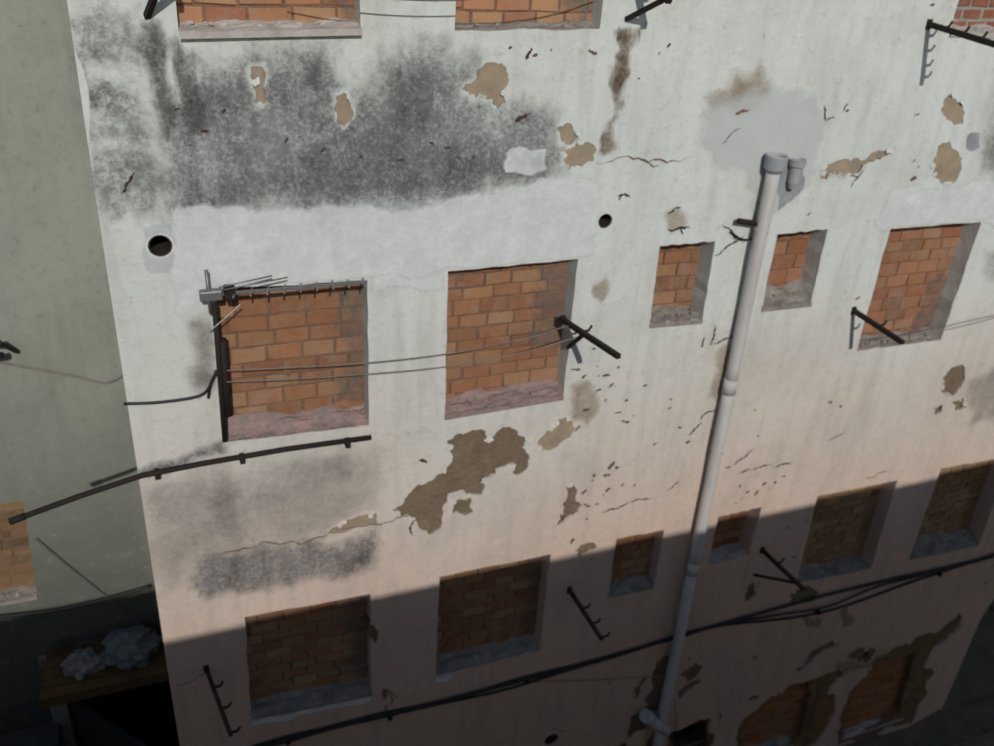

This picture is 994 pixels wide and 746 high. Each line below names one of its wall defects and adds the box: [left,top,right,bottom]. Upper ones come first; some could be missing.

flaking render [462,62,509,108]
water stain [84,14,560,214]
flaking render [941,92,965,125]
crack [596,156,693,167]
flaking render [820,147,894,180]
flaking render [911,142,962,186]
flaking render [394,417,581,534]
crack [204,515,414,557]
mould [196,535,375,594]
flaking render [623,655,672,746]
flaking render [678,657,702,697]
spalling [736,614,961,746]